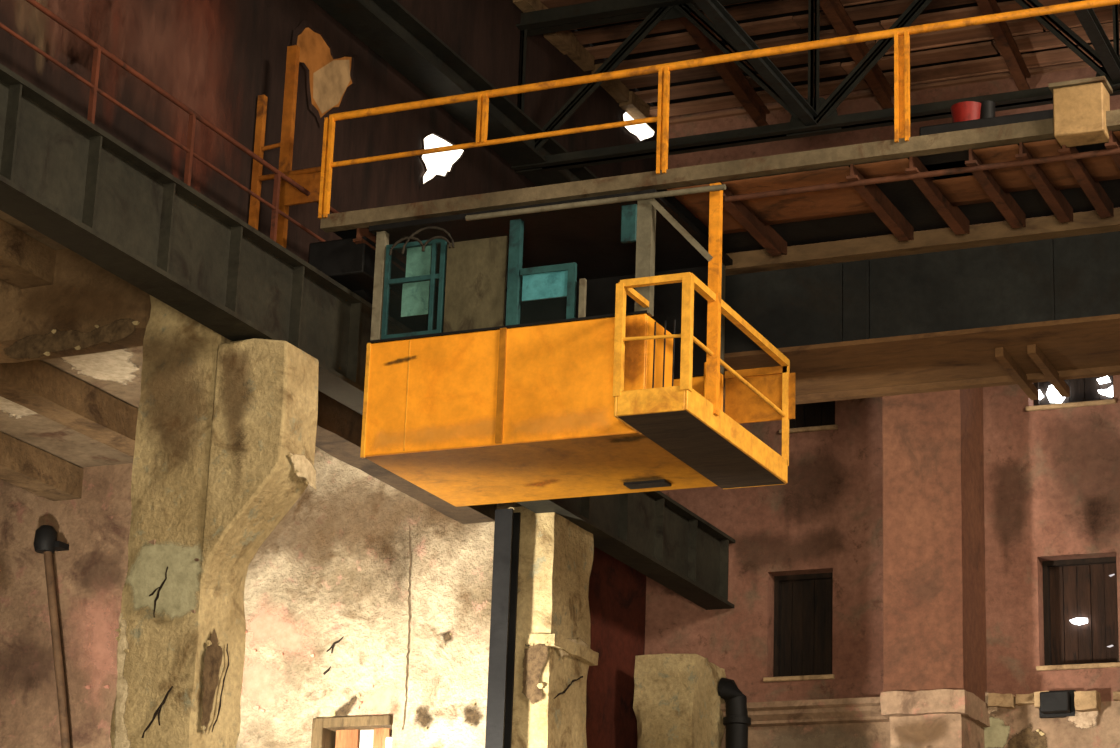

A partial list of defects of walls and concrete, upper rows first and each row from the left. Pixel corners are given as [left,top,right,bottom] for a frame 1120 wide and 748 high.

damp [148,341,197,451]
damp [224,357,248,436]
crack [149,567,168,618]
spalling [522,637,589,704]
crack [141,686,173,738]